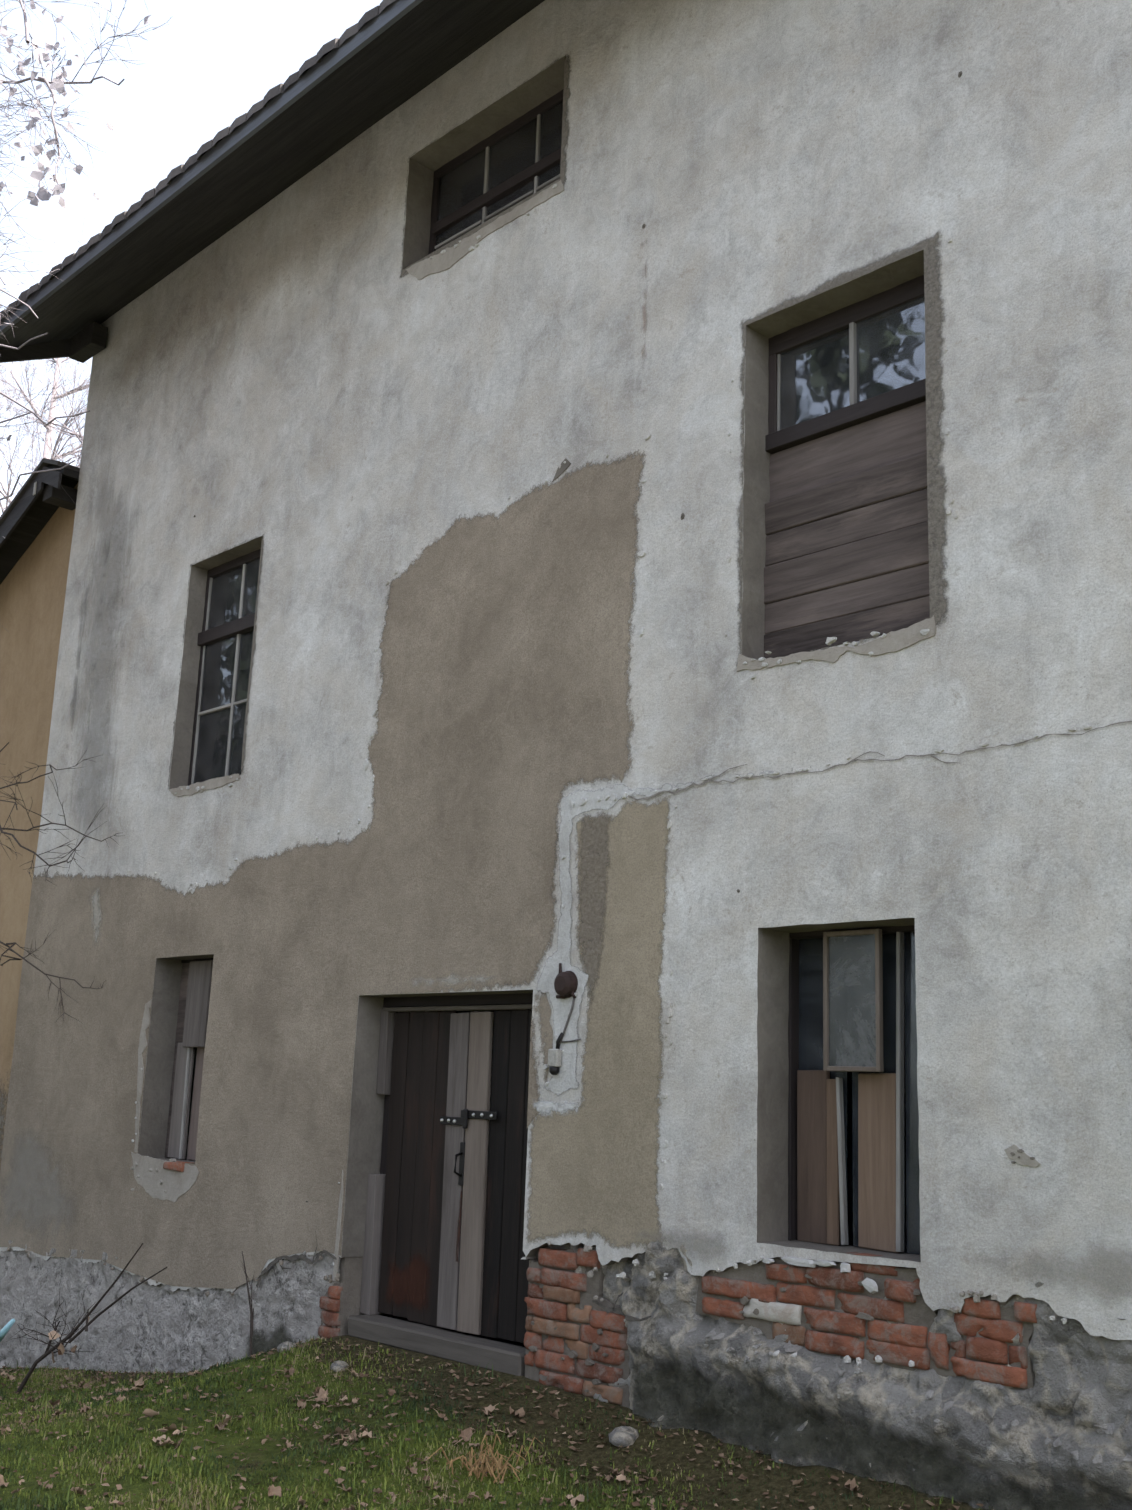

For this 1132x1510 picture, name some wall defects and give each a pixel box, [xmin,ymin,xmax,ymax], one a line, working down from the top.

peeling [0,435,1132,1510]
crack [628,721,1132,801]